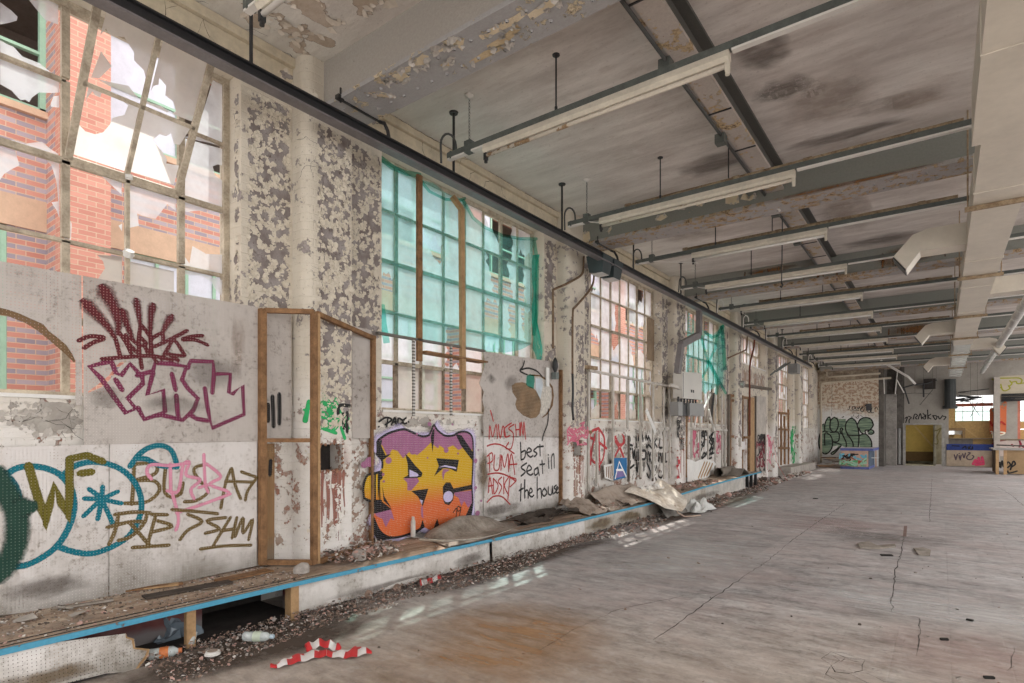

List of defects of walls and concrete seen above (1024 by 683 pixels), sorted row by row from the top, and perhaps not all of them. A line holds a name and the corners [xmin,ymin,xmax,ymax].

peeling [240,0,346,56]
peeling [369,36,465,99]
peeling [469,0,563,68]
peeling [232,90,293,426]
peeling [0,398,83,437]
peeling [305,123,383,548]
peeling [544,239,686,497]
crack [868,539,945,656]